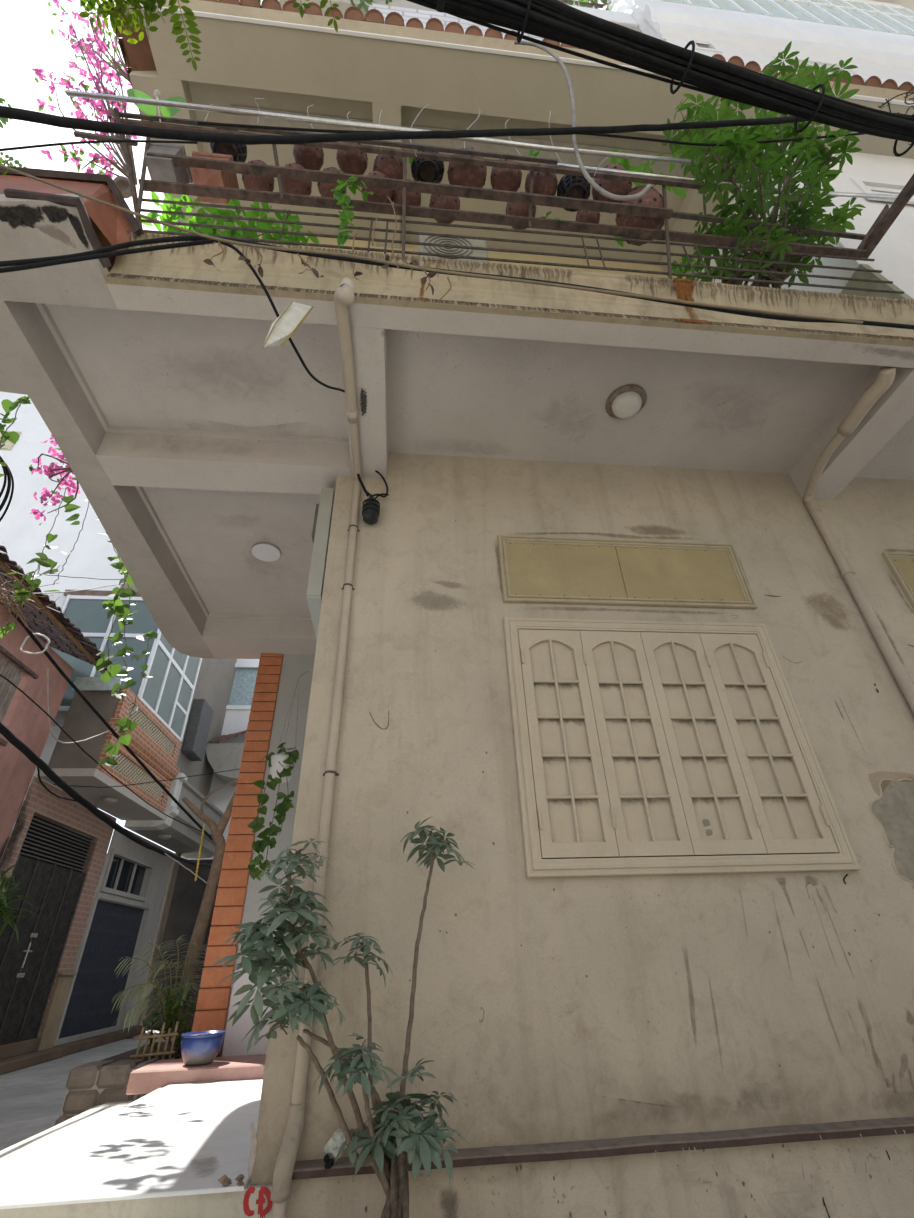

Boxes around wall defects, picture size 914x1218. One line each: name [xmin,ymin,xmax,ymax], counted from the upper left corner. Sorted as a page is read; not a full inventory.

leakage [107,273,335,294]
leakage [354,293,914,341]
rust [673,278,711,323]
peeling [869,778,914,884]